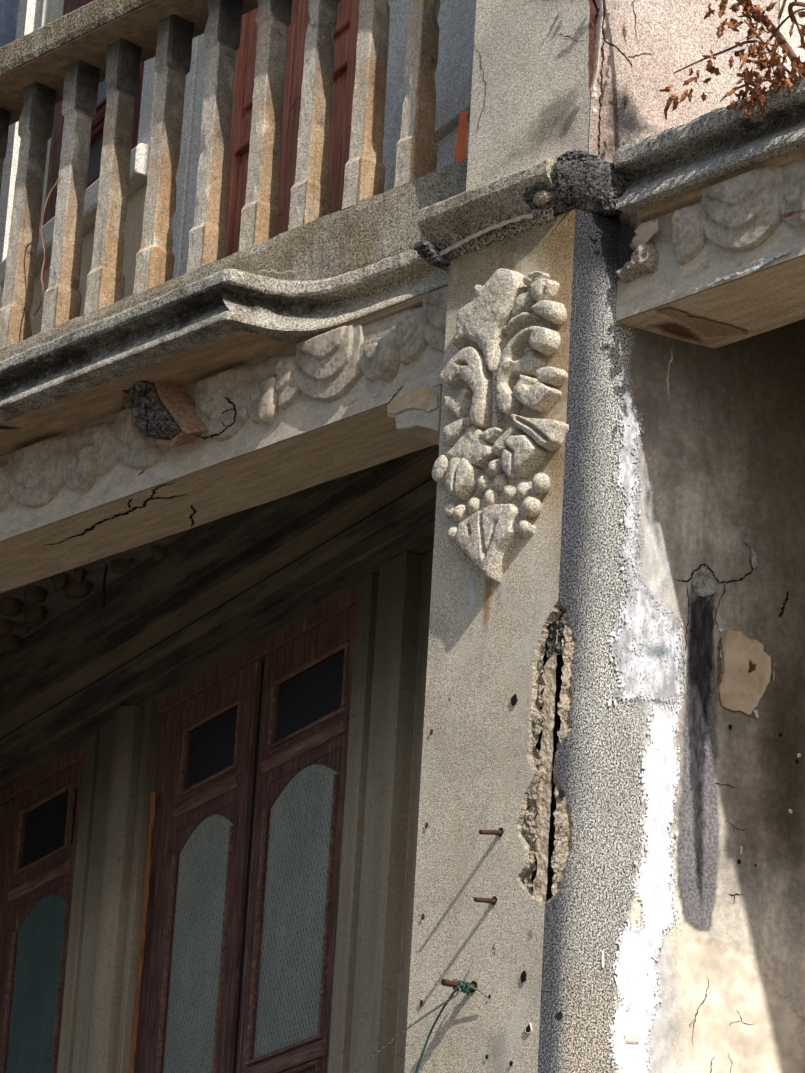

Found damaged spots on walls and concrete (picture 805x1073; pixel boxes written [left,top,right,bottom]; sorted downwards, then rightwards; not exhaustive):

crack [554,0,653,155]
spalling [413,150,631,272]
crack [141,381,149,437]
crack [43,469,196,546]
crack [671,556,753,682]
spalling [517,597,577,905]
damp [678,585,719,930]
peeling [601,358,805,1073]